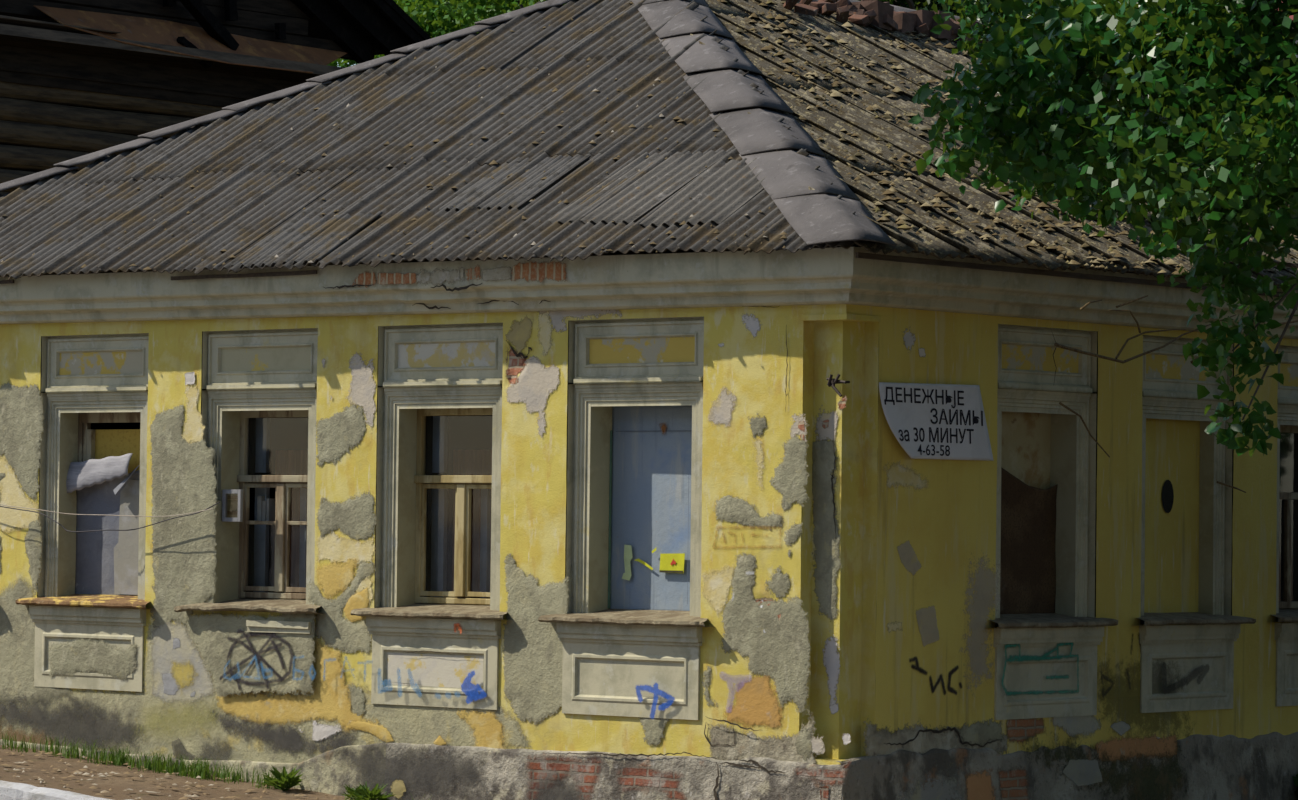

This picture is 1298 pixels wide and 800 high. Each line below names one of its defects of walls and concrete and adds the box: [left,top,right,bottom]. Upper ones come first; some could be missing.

flaking render [511,261,566,282]
peeling [181,372,205,443]
peeling [506,310,622,438]
peeling [789,395,848,442]
peeling [0,457,39,533]
crack [546,716,784,800]